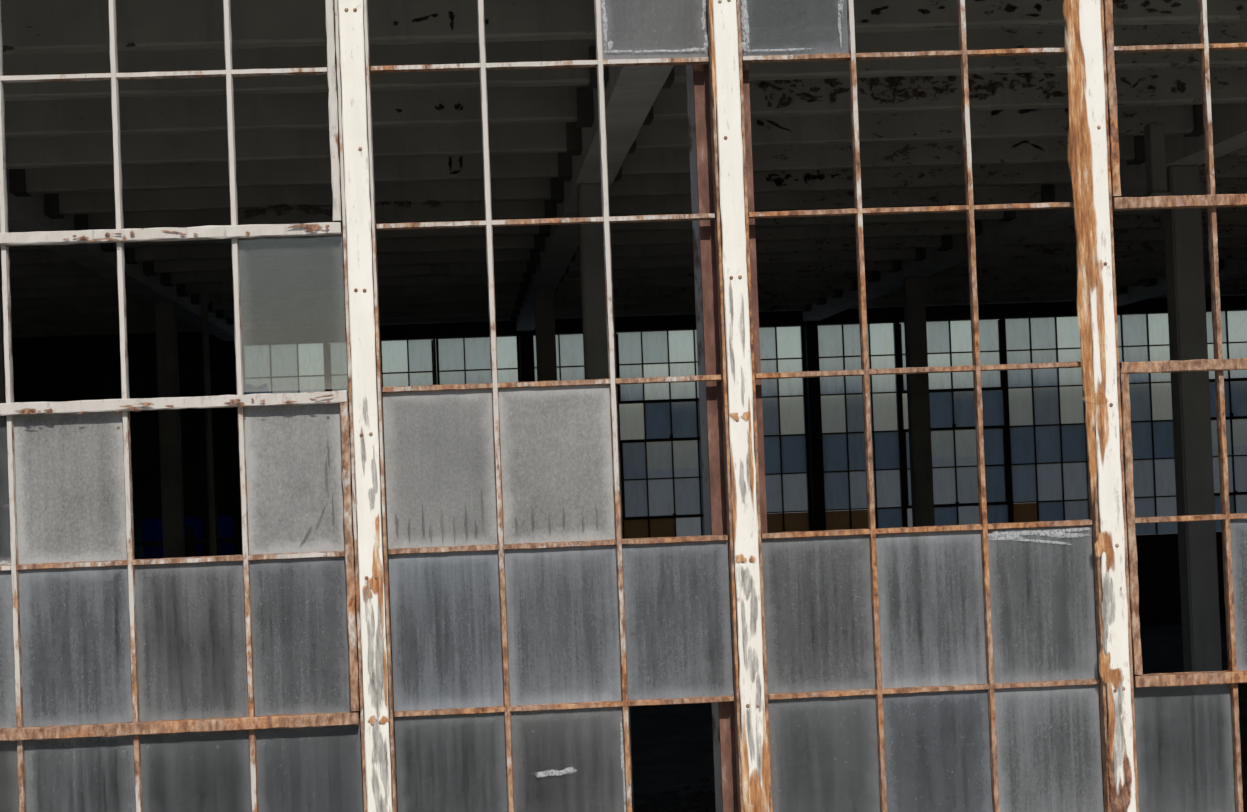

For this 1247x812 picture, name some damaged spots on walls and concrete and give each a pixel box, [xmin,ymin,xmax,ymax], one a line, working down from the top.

peeling [741,0,811,51]
peeling [838,0,888,44]
peeling [1112,0,1181,14]
peeling [755,73,1069,131]
rust [1064,0,1109,499]
peeling [729,279,745,405]
peeling [361,397,378,510]
peeling [740,433,750,503]
rust [1095,532,1115,572]
peeling [365,585,388,812]
peeling [741,567,762,782]
rust [1100,650,1132,812]